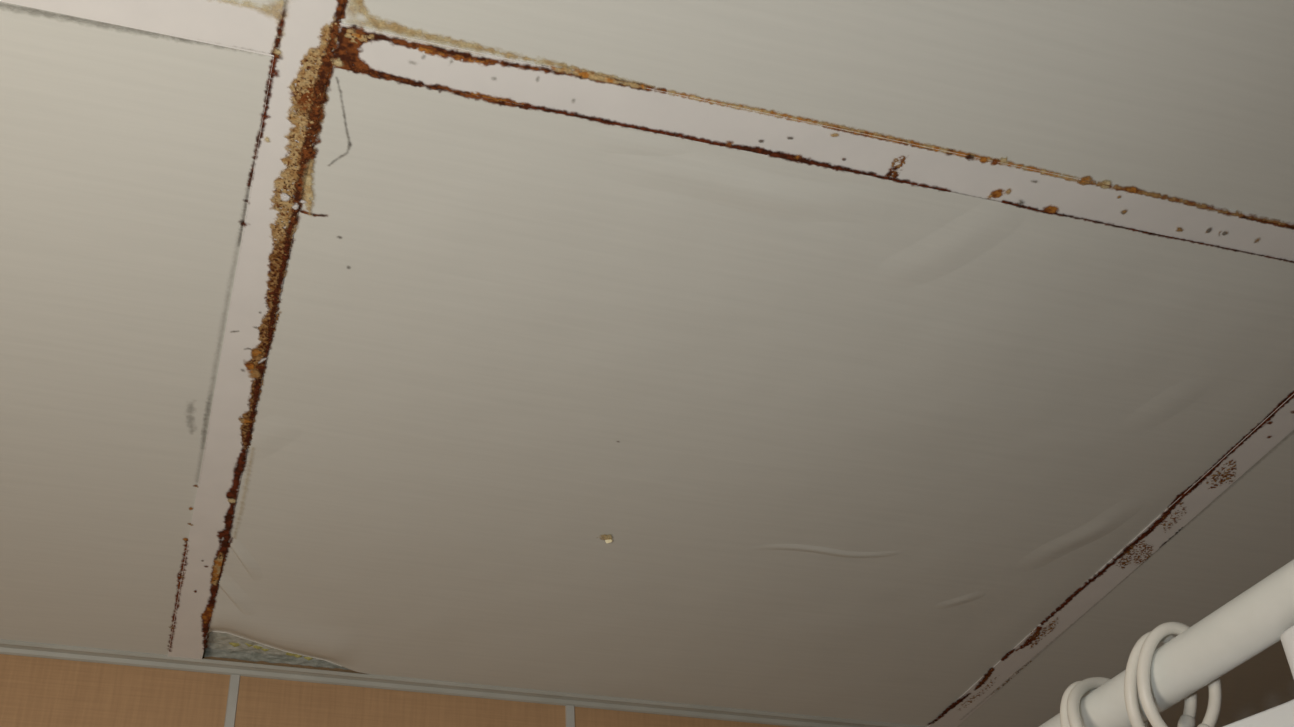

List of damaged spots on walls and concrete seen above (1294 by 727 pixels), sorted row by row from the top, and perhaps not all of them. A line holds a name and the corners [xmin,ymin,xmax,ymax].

rust [168,0,1294,652]
peeling [203,631,350,670]
rust [928,391,1294,725]